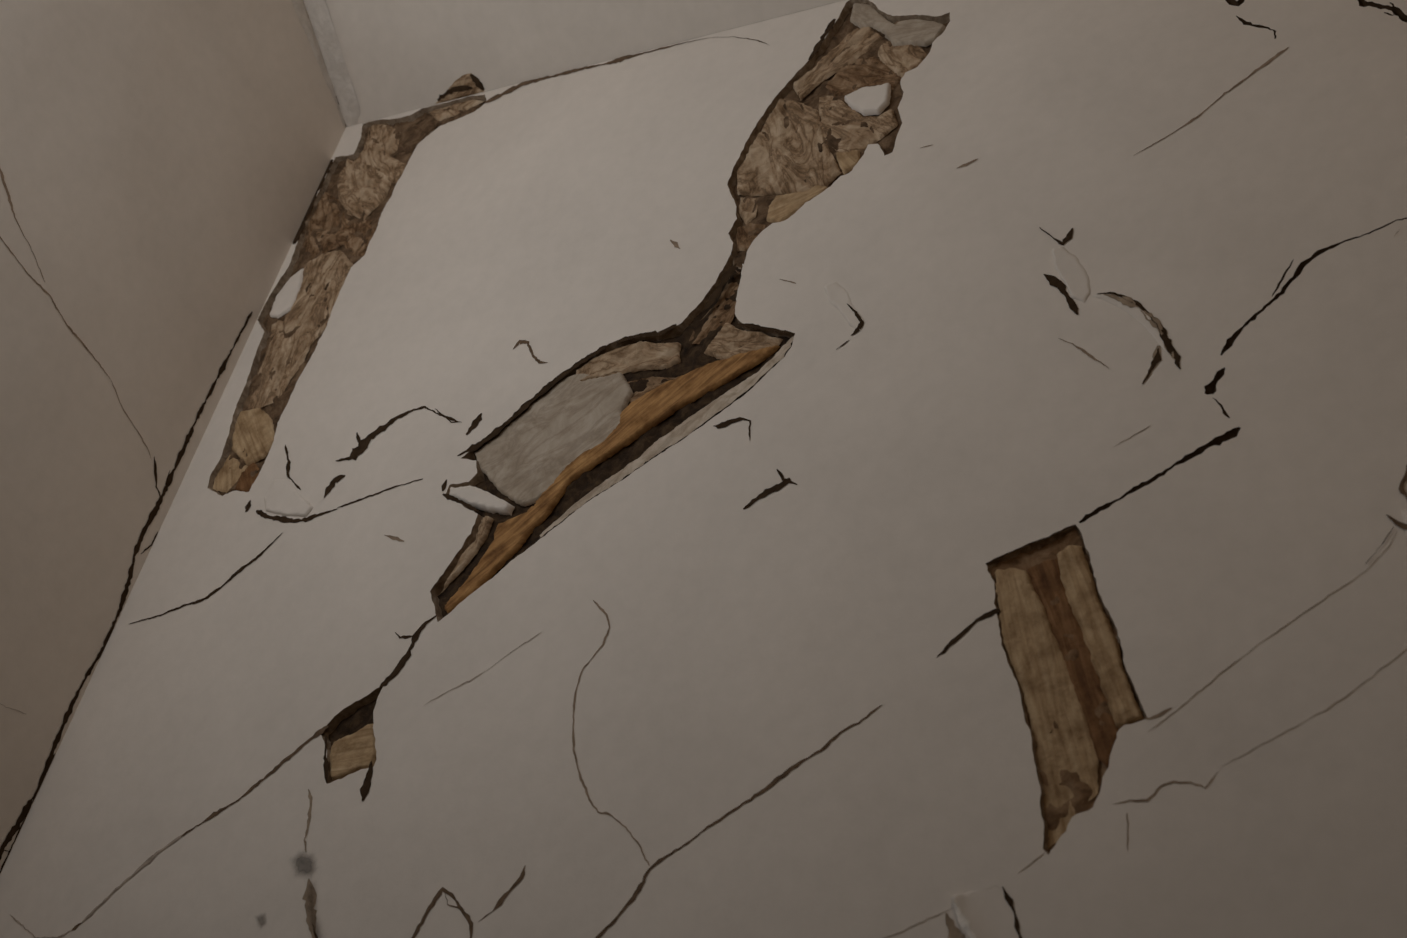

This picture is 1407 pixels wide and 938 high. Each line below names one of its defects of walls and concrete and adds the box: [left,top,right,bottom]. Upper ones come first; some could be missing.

crack [1358,0,1407,22]
crack [0,169,482,873]
flaking render [208,0,486,517]
flaking render [430,0,950,622]
crack [743,469,797,509]
crack [1079,218,1407,523]
crack [10,725,328,938]
flaking render [321,686,383,784]
crack [412,866,525,938]
crack [572,600,882,938]
flaking render [945,885,1022,938]
flaking render [986,525,1148,855]